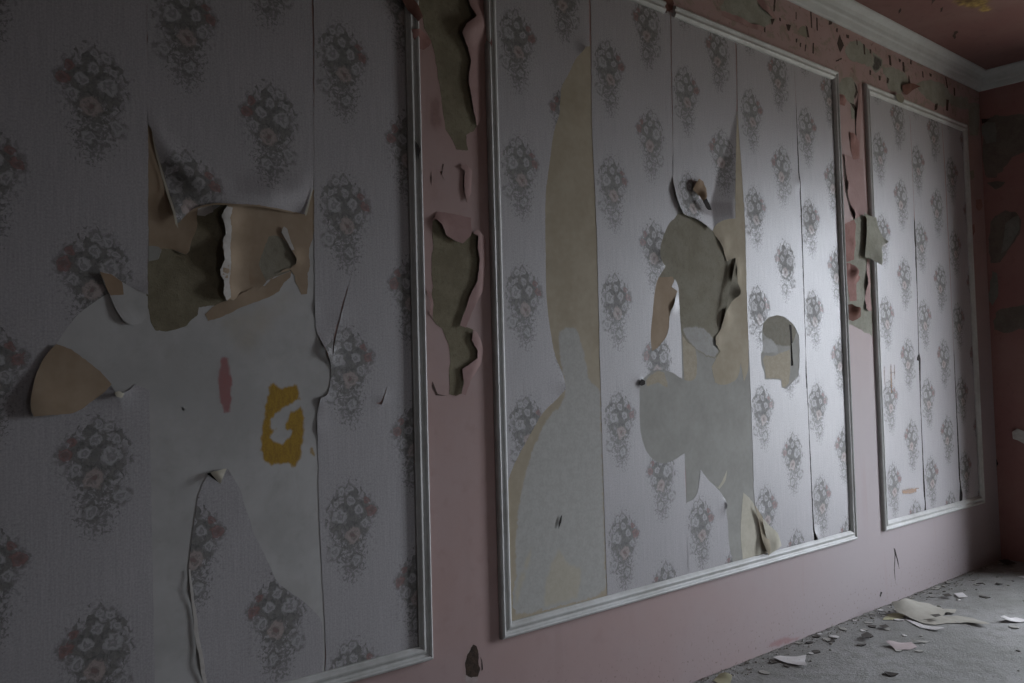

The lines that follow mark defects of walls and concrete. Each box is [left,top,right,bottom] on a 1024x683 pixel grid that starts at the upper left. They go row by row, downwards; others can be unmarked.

peeling [402,0,492,150]
flaking render [146,205,227,332]
flaking render [259,235,297,280]
peeling [427,212,487,396]
flaking render [659,213,737,359]
flaking render [762,315,797,348]
peeling [839,40,920,336]
spalling [461,641,483,683]